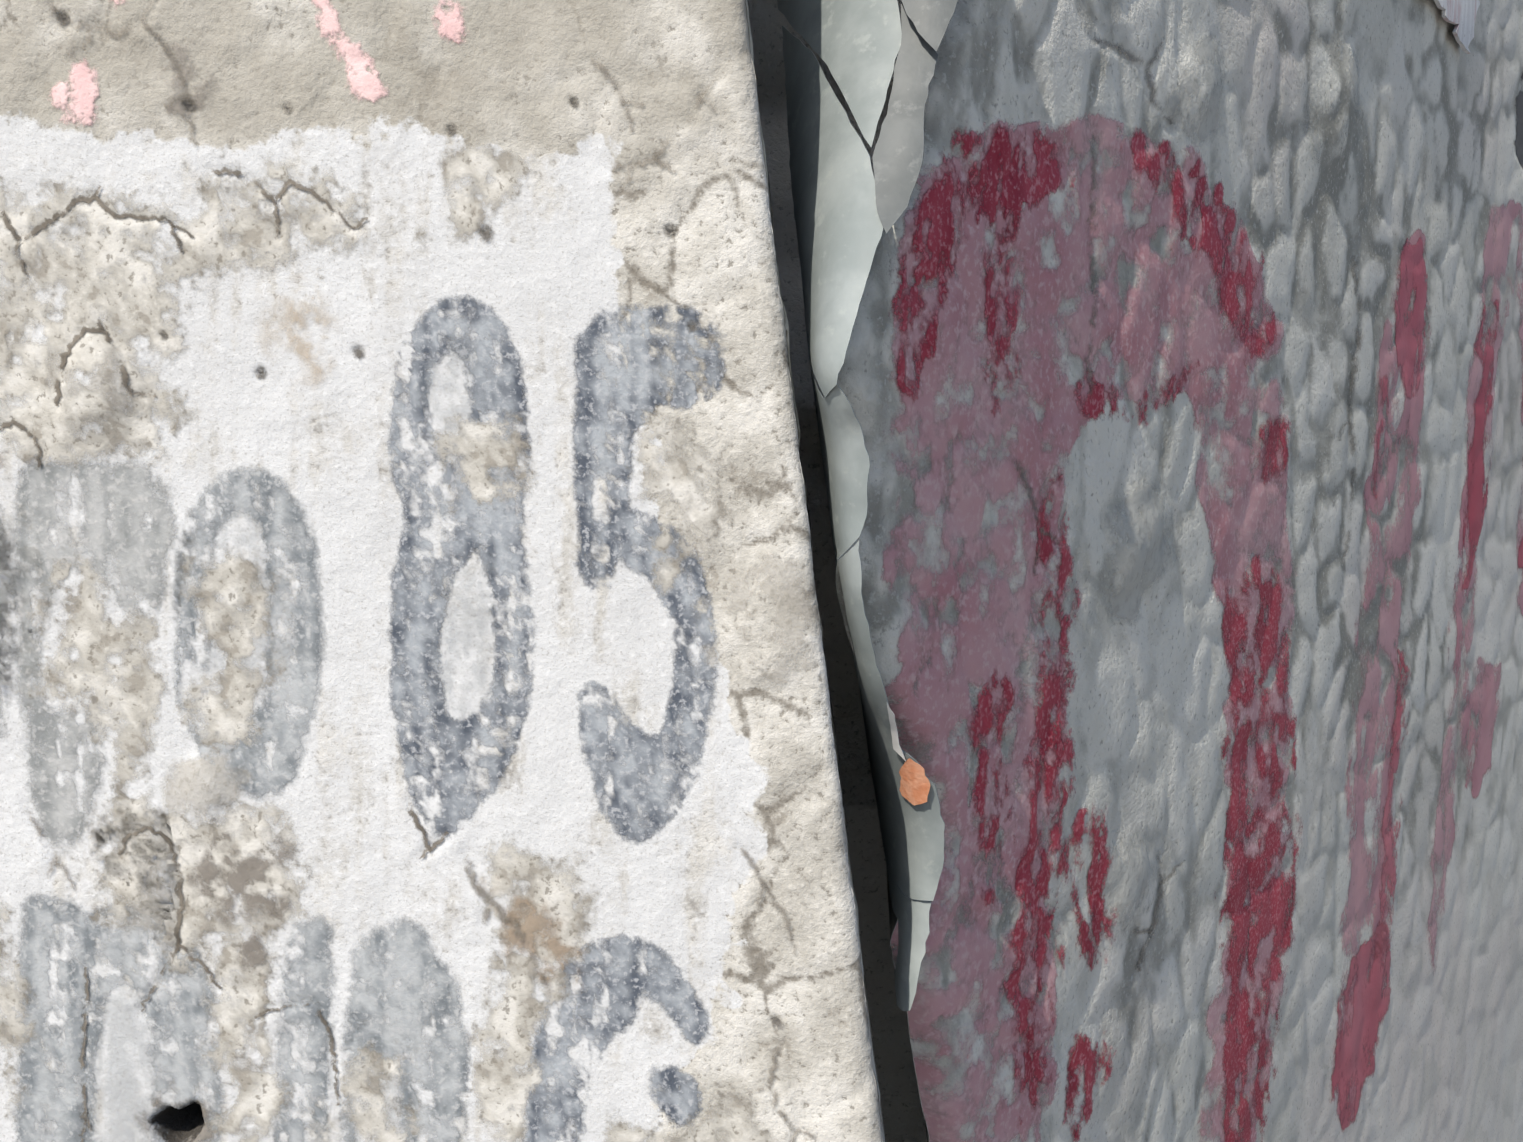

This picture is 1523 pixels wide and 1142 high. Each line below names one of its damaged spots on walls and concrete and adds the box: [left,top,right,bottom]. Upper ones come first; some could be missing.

spalling [1515,73,1523,168]
crack [1,185,194,274]
crack [54,320,156,406]
crack [0,419,43,467]
peeling [777,0,958,1011]
peeling [28,554,308,1142]
peeling [470,842,592,1142]
peeling [341,1044,419,1142]